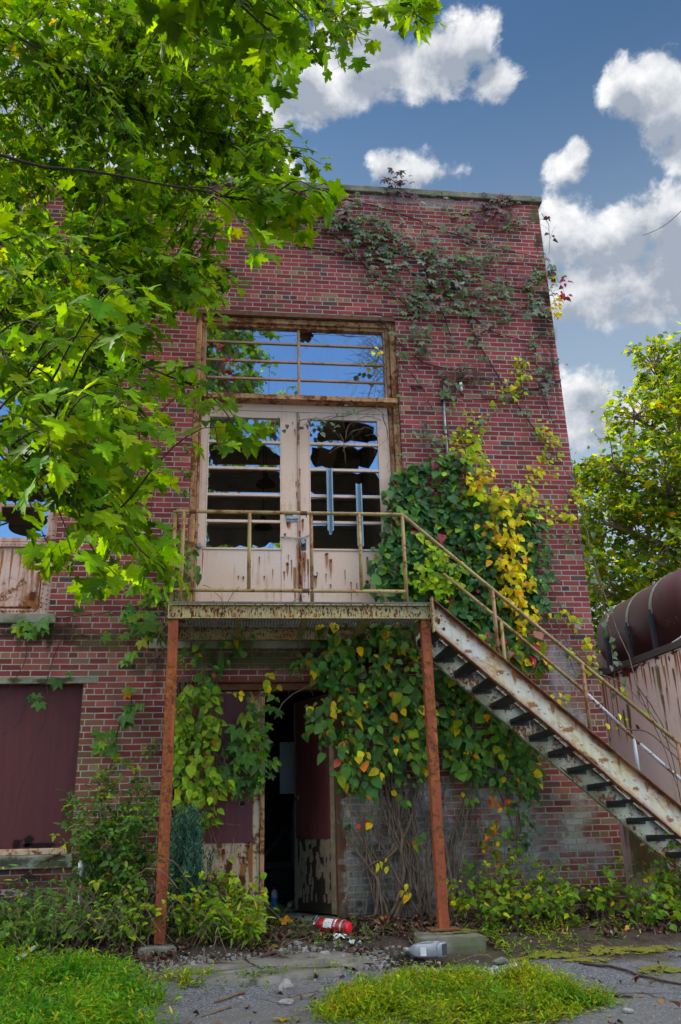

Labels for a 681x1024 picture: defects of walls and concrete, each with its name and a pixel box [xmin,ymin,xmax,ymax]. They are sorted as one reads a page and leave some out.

rust [0,549,43,609]
rust [179,515,419,618]
damp [616,704,632,736]
rust [599,650,681,768]
damp [651,665,681,732]
peeling [297,839,332,904]